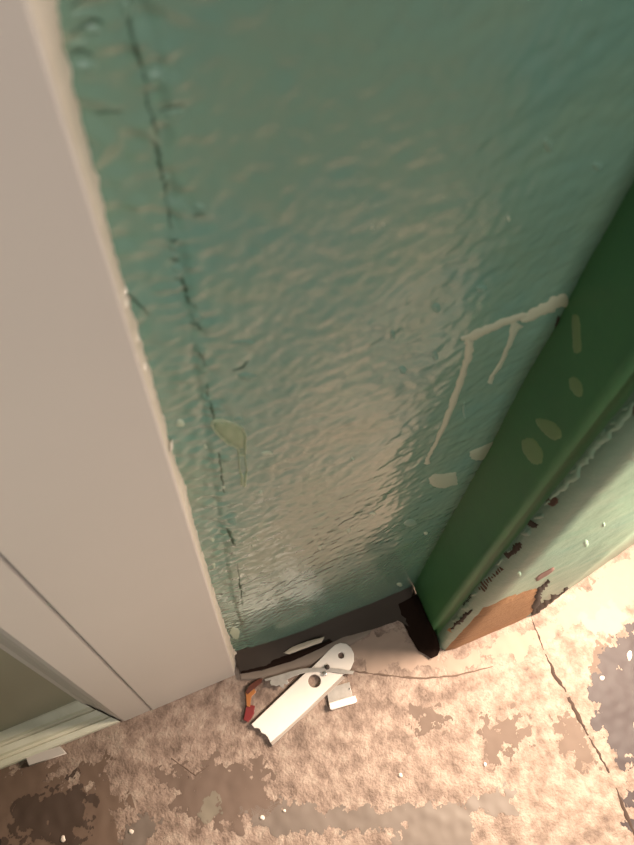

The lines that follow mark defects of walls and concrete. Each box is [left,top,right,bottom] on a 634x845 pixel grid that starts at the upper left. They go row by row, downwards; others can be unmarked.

crack [127,16,216,427]
crack [226,527,243,605]
peeling [504,542,522,559]
spalling [240,630,372,680]
hole [398,594,440,658]
crack [532,620,634,835]